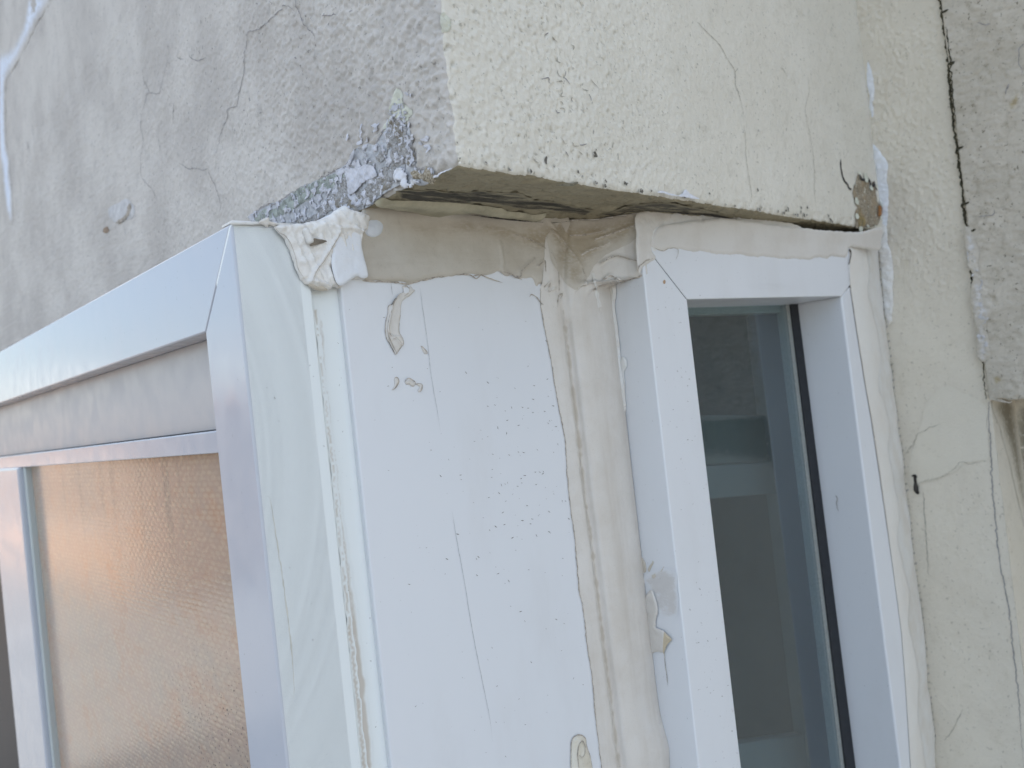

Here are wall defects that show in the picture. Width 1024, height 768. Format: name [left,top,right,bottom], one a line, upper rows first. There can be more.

crack [181,0,336,208]
peeling [248,88,452,224]
leakage [396,181,738,290]
spalling [853,171,883,232]
crack [938,0,995,232]
crack [904,362,1023,756]